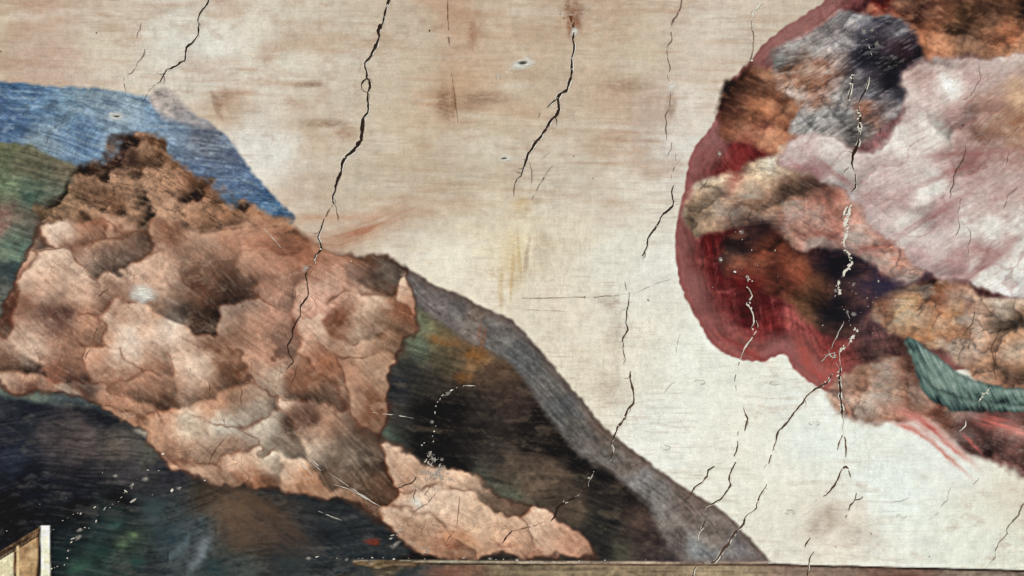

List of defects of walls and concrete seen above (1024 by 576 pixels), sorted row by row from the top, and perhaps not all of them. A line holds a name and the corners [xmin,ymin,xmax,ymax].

crack [124,0,210,100]
crack [287,0,390,386]
crack [513,2,594,200]
flaking render [831,205,877,352]
peeling [419,385,465,480]
crack [503,279,670,542]
crack [685,276,863,576]